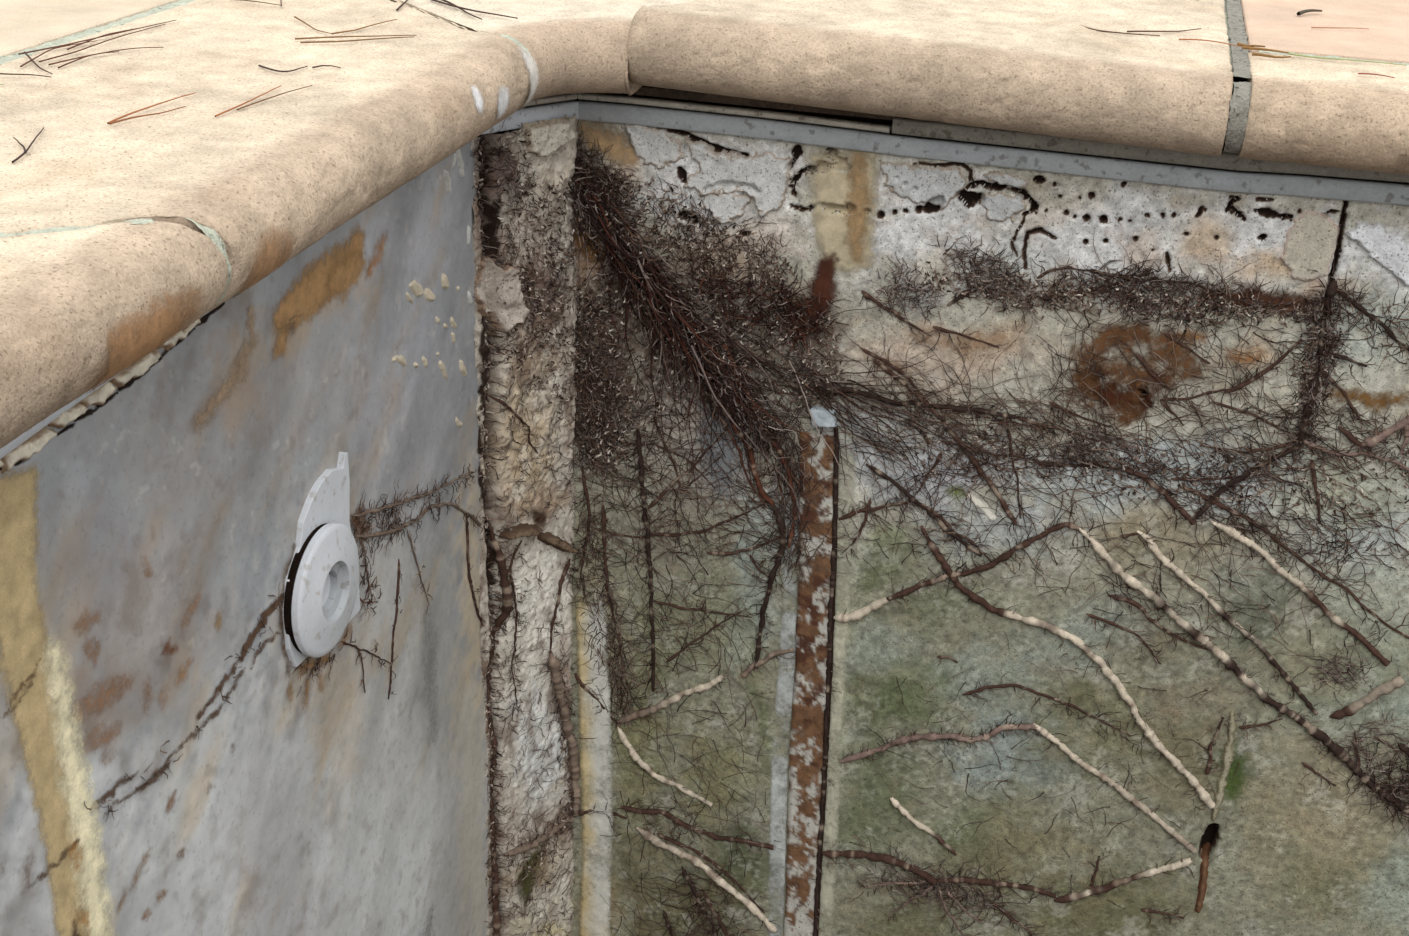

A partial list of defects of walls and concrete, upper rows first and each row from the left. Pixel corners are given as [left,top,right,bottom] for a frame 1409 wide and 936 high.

peeling [523,114,576,157]
corrosion [274,228,384,358]
corrosion [784,253,838,339]
peeling [878,160,1057,269]
crack [1325,200,1349,282]
spalling [0,294,237,474]
corrosion [1066,323,1209,426]
water stain [41,642,113,936]